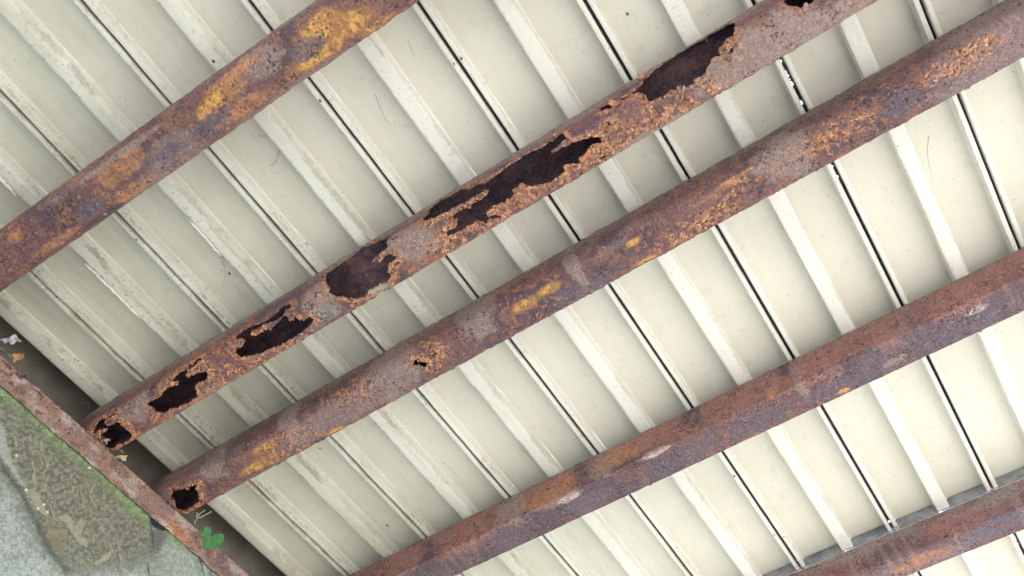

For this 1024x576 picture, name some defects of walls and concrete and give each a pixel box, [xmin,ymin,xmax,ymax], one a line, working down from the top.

rust [296,8,392,69]
rust [197,54,269,129]
rust [609,64,736,153]
rust [790,109,880,160]
rust [93,145,157,202]
rust [421,164,598,264]
rust [639,165,770,264]
rust [513,281,559,312]
rust [158,324,323,424]
rust [242,423,342,475]
rust [597,417,682,471]
rust [374,509,502,576]